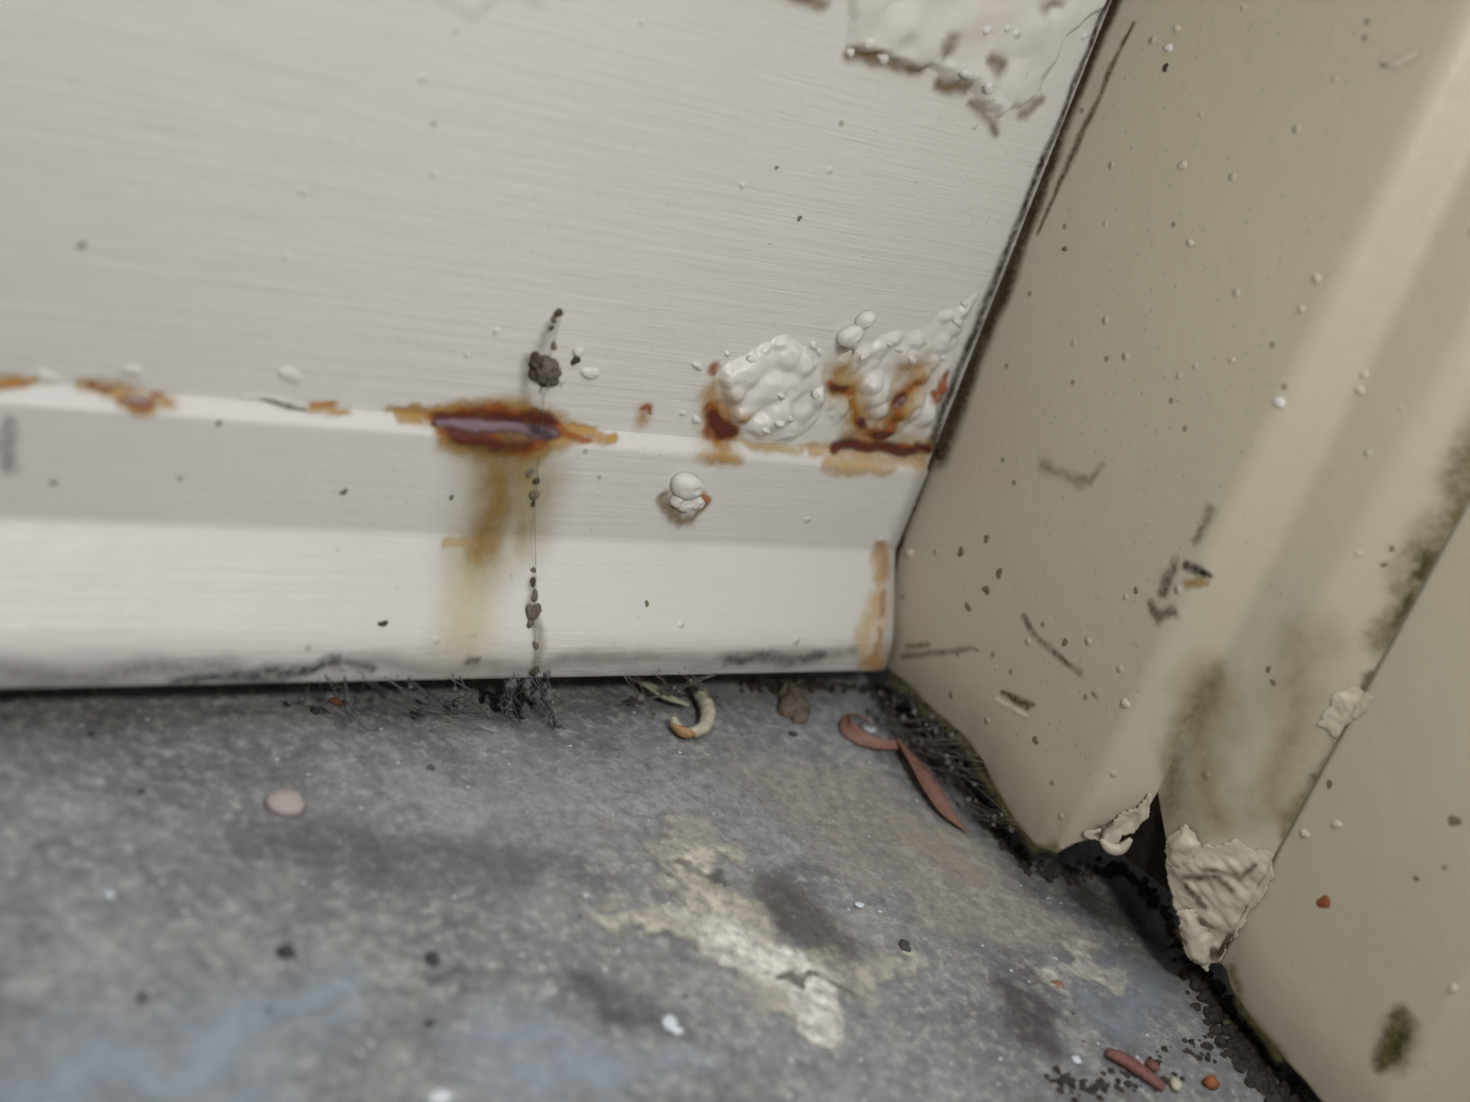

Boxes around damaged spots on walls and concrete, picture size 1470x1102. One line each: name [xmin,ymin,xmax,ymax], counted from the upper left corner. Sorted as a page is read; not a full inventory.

corrosion [0,376,38,388]
corrosion [78,382,173,415]
corrosion [304,401,348,414]
corrosion [704,364,750,463]
corrosion [810,363,949,475]
corrosion [387,400,617,635]
leakage [1376,447,1470,644]
peeling [1083,793,1153,856]
peeling [1164,824,1275,972]